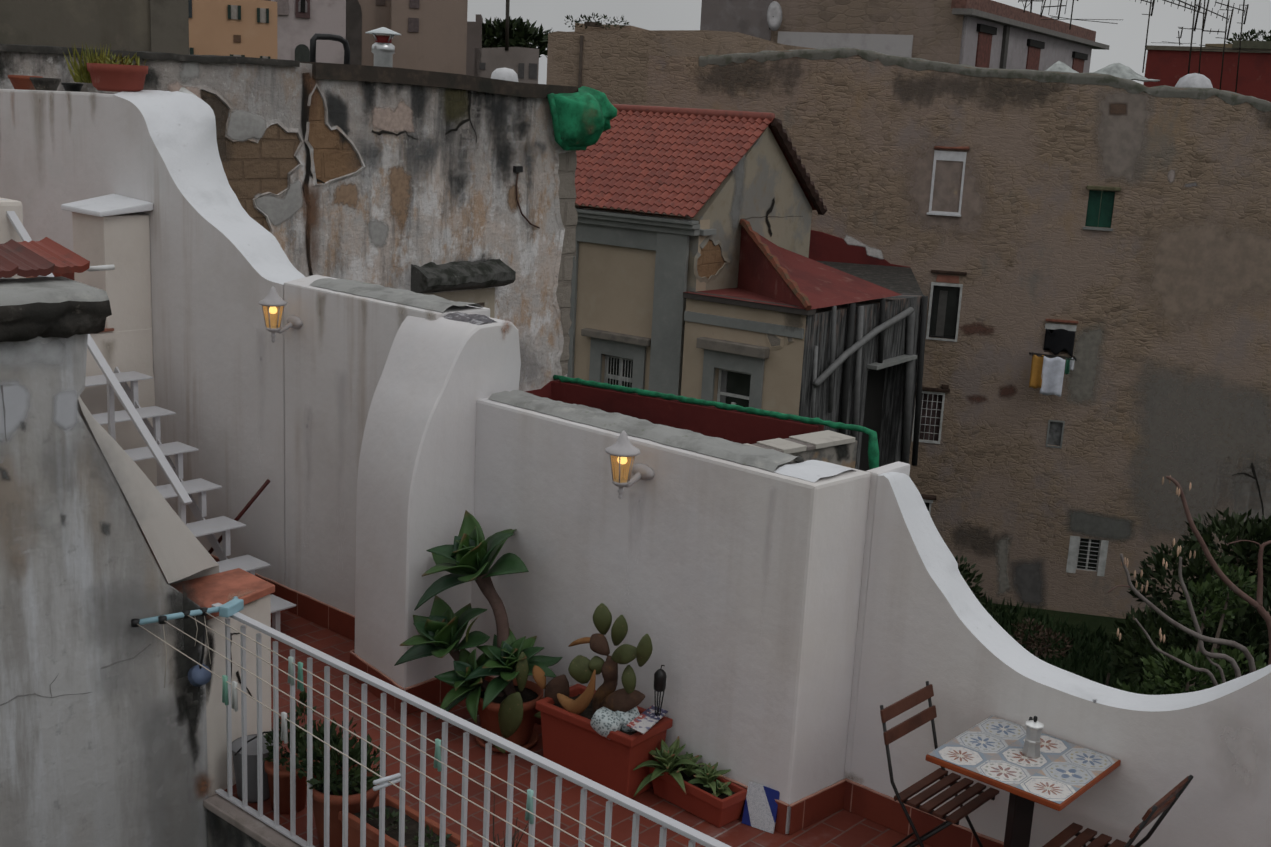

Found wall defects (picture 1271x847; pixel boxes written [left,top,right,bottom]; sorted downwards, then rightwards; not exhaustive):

spalling [168,82,366,235]
crack [301,73,325,276]
leakage [327,91,349,141]
leakage [361,81,428,118]
leakage [389,140,437,226]
crack [371,90,477,143]
leakage [473,91,545,170]
leakage [508,185,520,210]
crack [744,198,803,236]
spalling [694,236,731,284]
crack [0,644,151,706]
leakage [169,583,214,761]